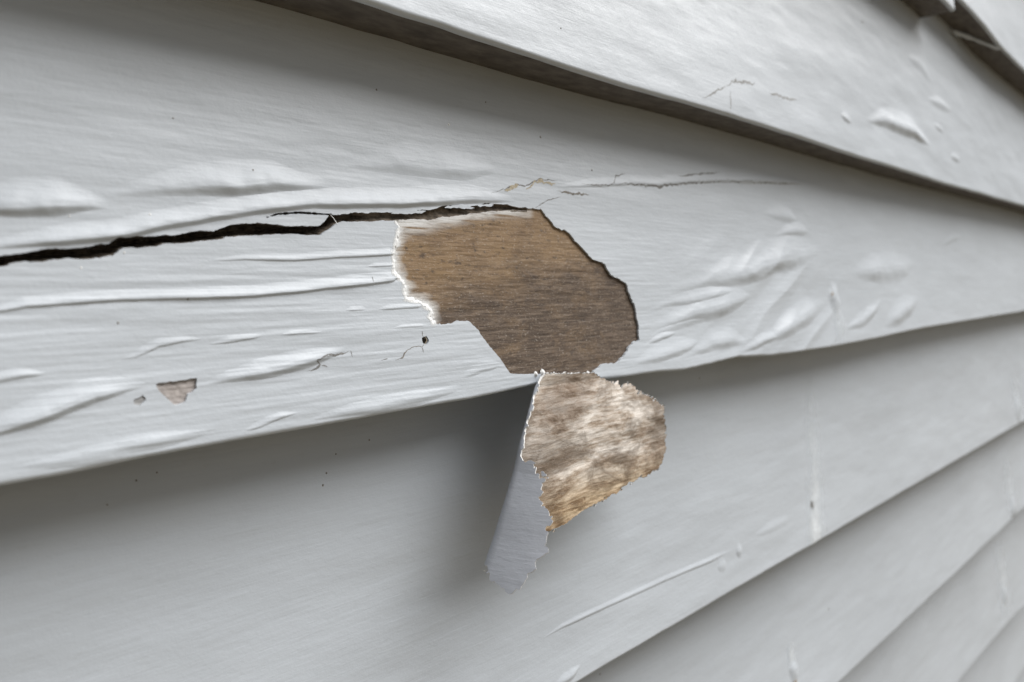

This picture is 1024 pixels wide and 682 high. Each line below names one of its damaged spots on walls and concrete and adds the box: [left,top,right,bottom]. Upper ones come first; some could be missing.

crack [0,172,802,267]
peeling [156,378,196,405]
peeling [391,204,667,594]